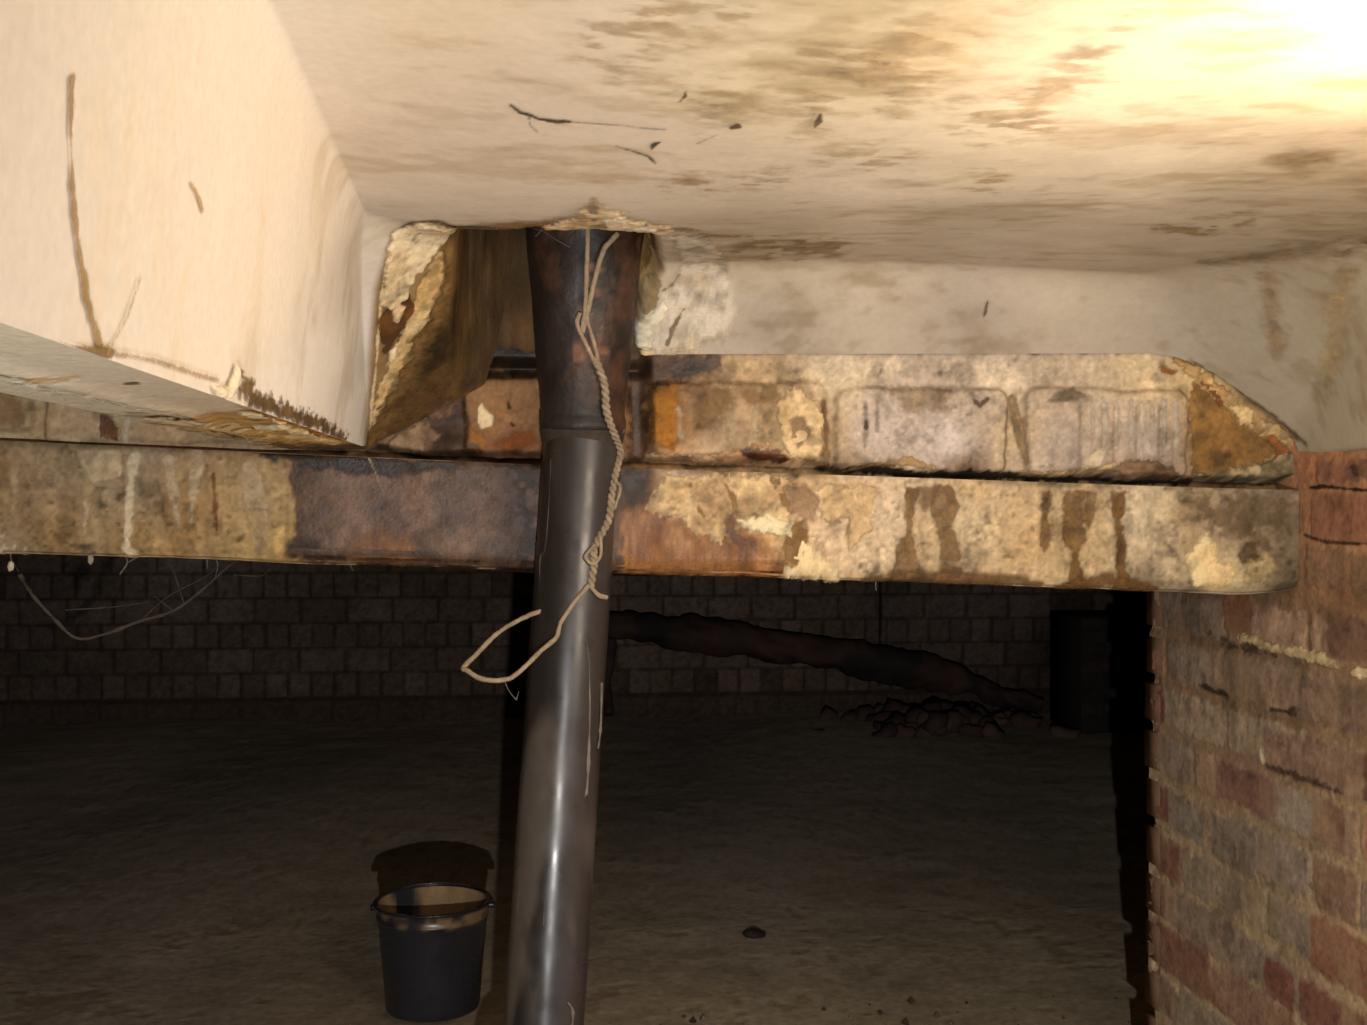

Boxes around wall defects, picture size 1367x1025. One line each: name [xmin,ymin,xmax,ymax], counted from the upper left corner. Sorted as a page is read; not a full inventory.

crack [510,105,574,124]
crack [616,129,660,164]
damp [1277,153,1329,166]
damp [679,179,713,191]
crack [69,74,219,381]
damp [1155,226,1216,236]
spalling [367,199,739,454]
spalling [120,363,349,446]
damp [0,379,219,558]
crack [1310,484,1367,492]
corrosion [618,471,783,579]
crack [1304,534,1360,545]